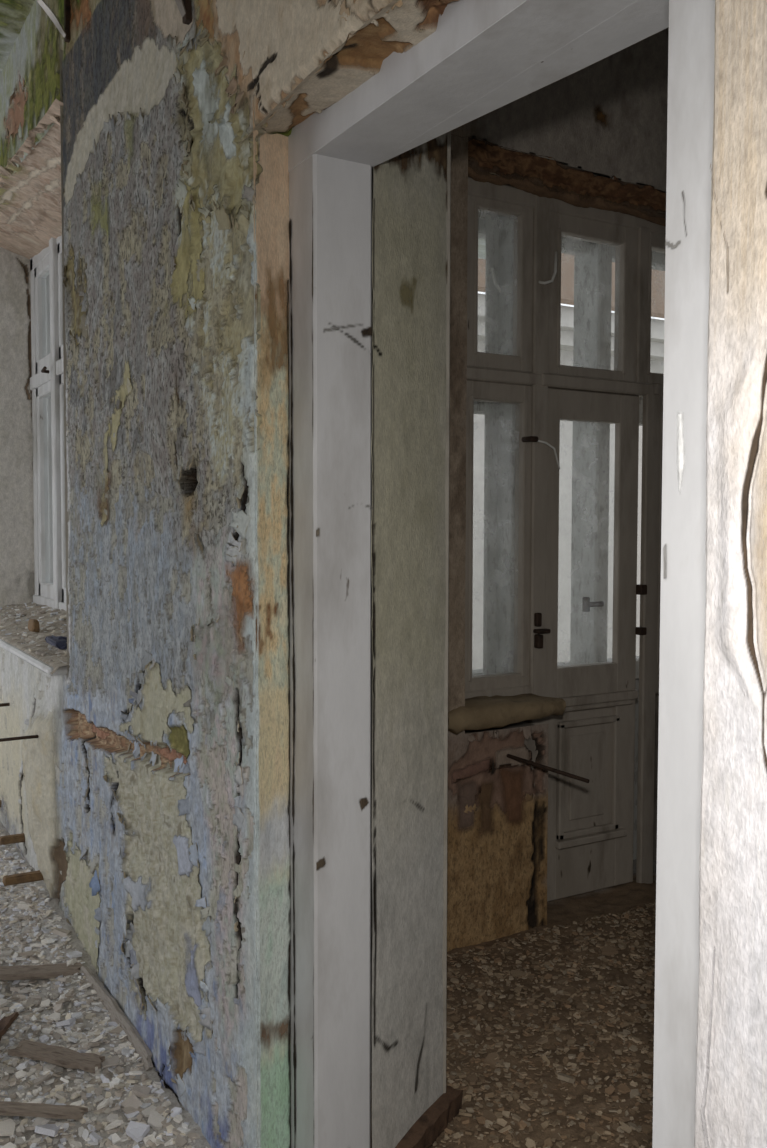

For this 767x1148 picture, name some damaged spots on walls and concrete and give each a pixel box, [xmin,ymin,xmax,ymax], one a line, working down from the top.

peeling [0,0,458,320]
spalling [468,139,666,227]
peeling [63,245,89,348]
peeling [97,360,133,526]
spalling [174,440,198,515]
crack [741,354,767,771]
peeling [63,650,213,1097]